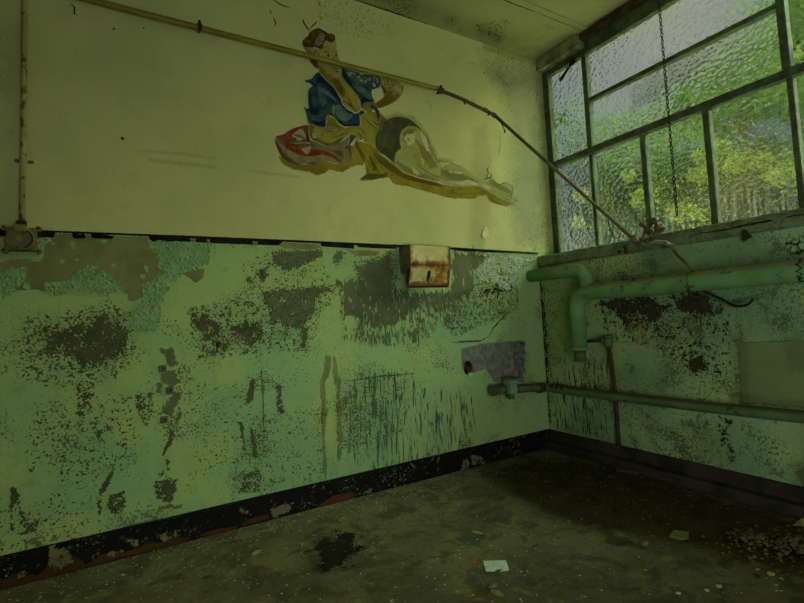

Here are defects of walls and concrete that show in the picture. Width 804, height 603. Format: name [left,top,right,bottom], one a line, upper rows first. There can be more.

peeling [592,290,734,376]
peeling [0,234,407,591]
leakage [320,356,474,480]
peeling [718,416,735,462]
leakage [304,527,366,574]